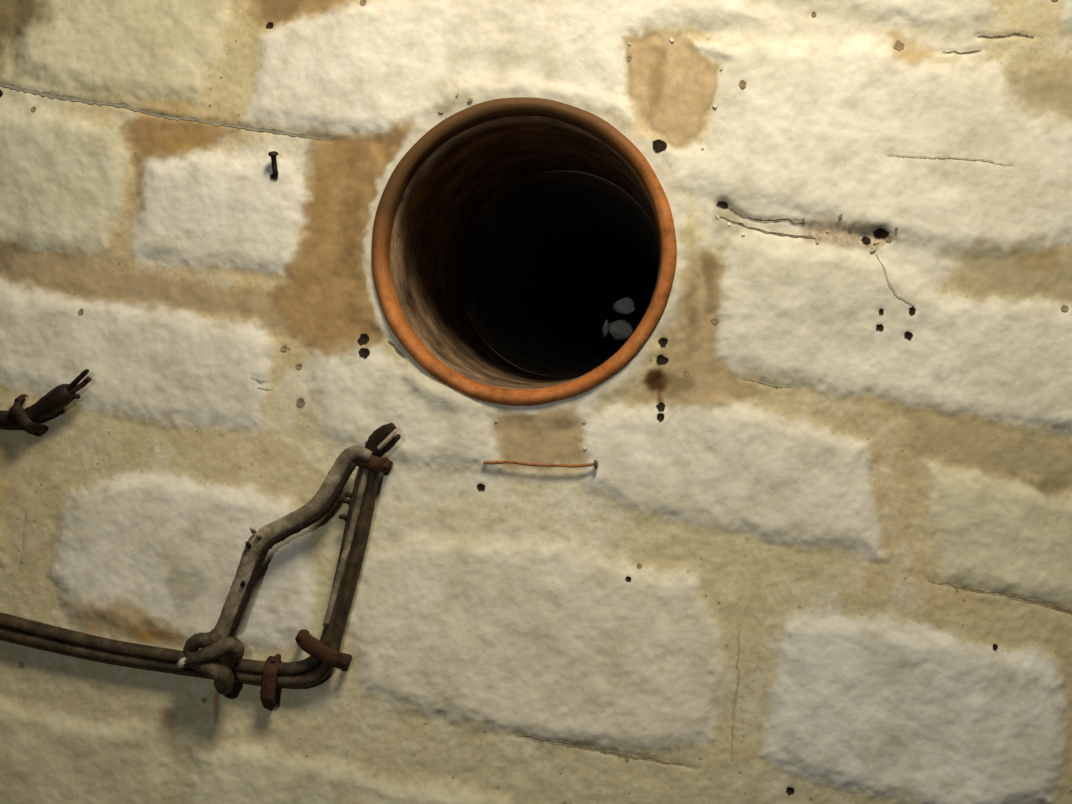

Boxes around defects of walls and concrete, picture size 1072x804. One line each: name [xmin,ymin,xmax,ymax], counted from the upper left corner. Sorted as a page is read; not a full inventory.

crack [720,208,818,239]
crack [876,253,915,305]
crack [928,580,1072,614]